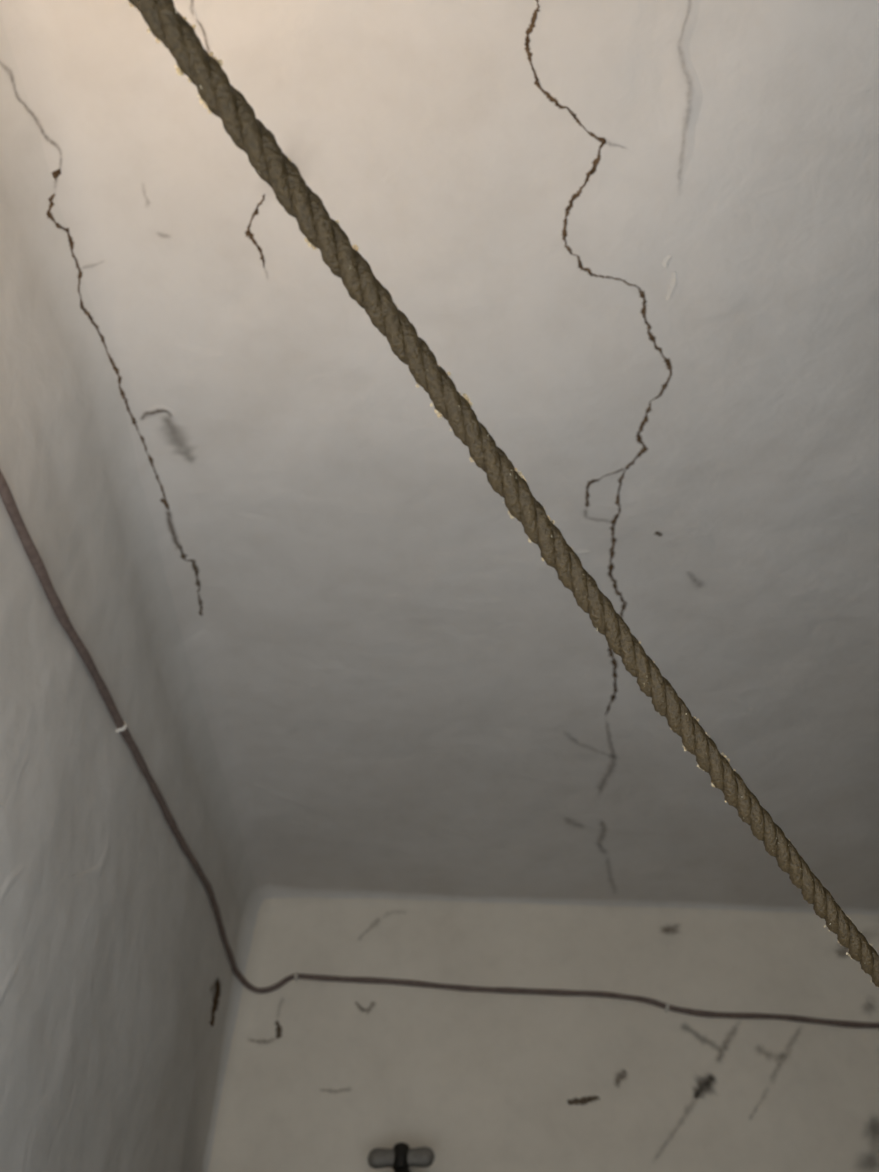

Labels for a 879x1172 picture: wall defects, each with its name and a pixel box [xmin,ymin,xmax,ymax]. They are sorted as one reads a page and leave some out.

crack [46,169,203,616]
crack [245,194,265,267]
crack [524,0,673,617]
crack [605,647,618,716]